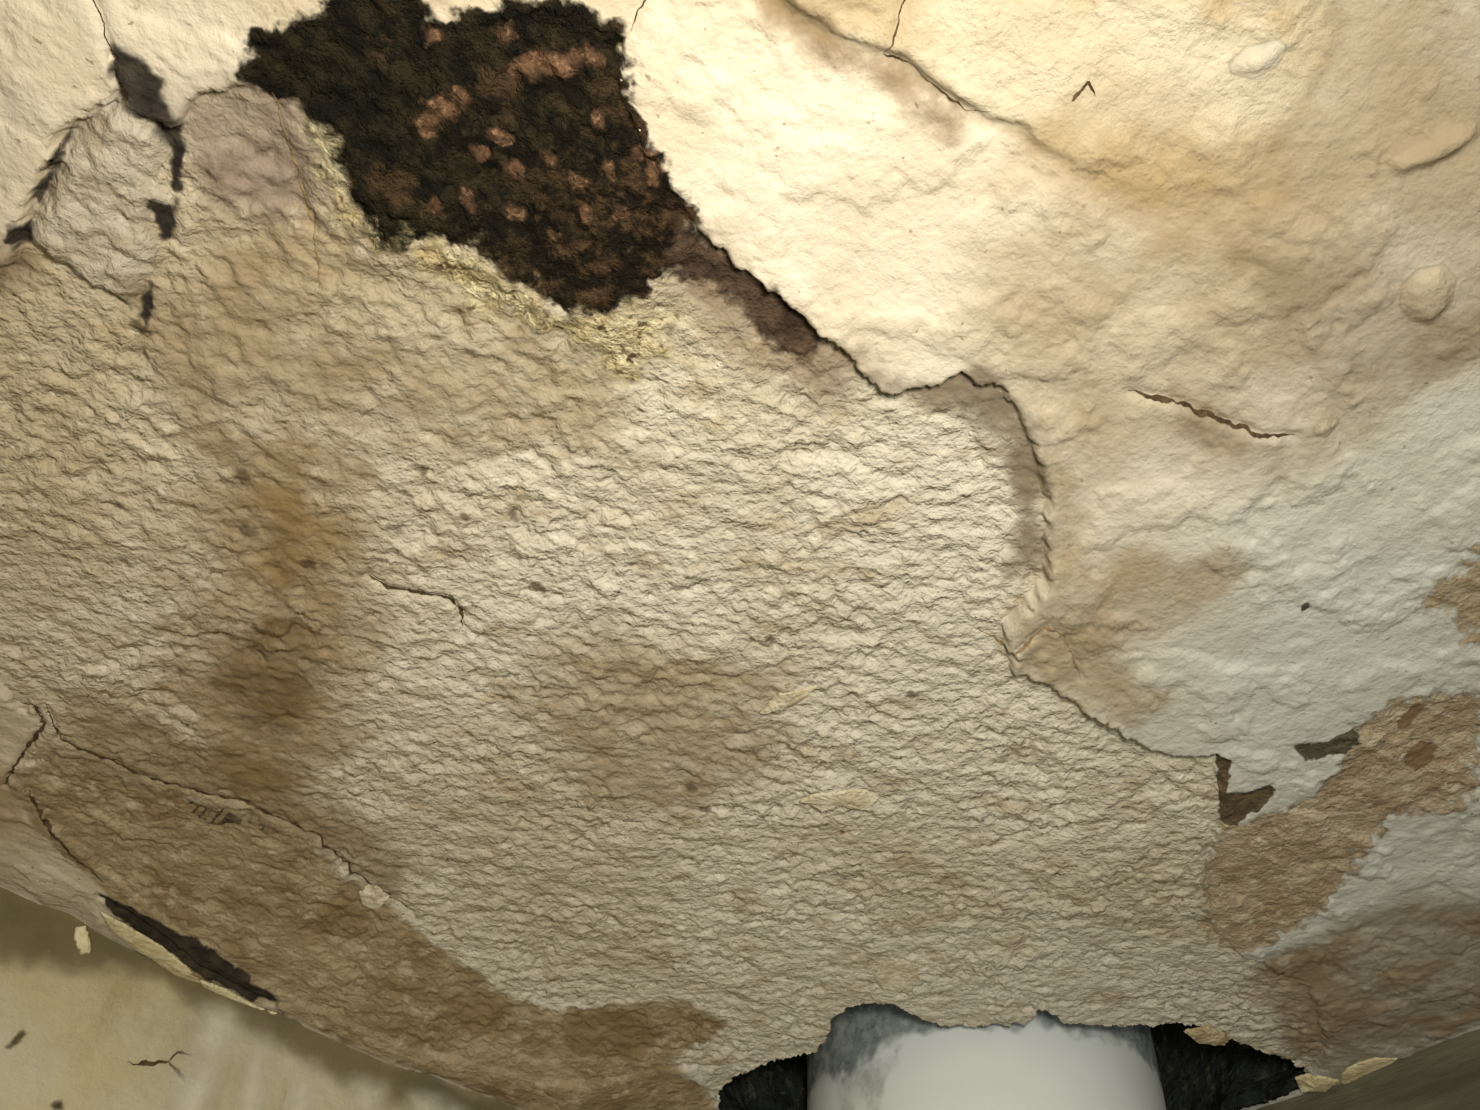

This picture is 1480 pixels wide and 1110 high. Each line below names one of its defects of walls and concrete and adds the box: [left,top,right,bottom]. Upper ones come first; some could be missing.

crack [4,131,71,248]
crack [93,0,186,240]
damp [1088,149,1213,210]
damp [1190,2,1480,366]
crack [1129,390,1295,439]
crack [5,700,415,1014]
damp [0,887,519,1110]
peeling [11,753,726,1110]
spalling [718,1053,807,1110]
spalling [1150,1022,1339,1110]
peeling [1197,691,1480,954]
damp [1264,905,1480,1087]